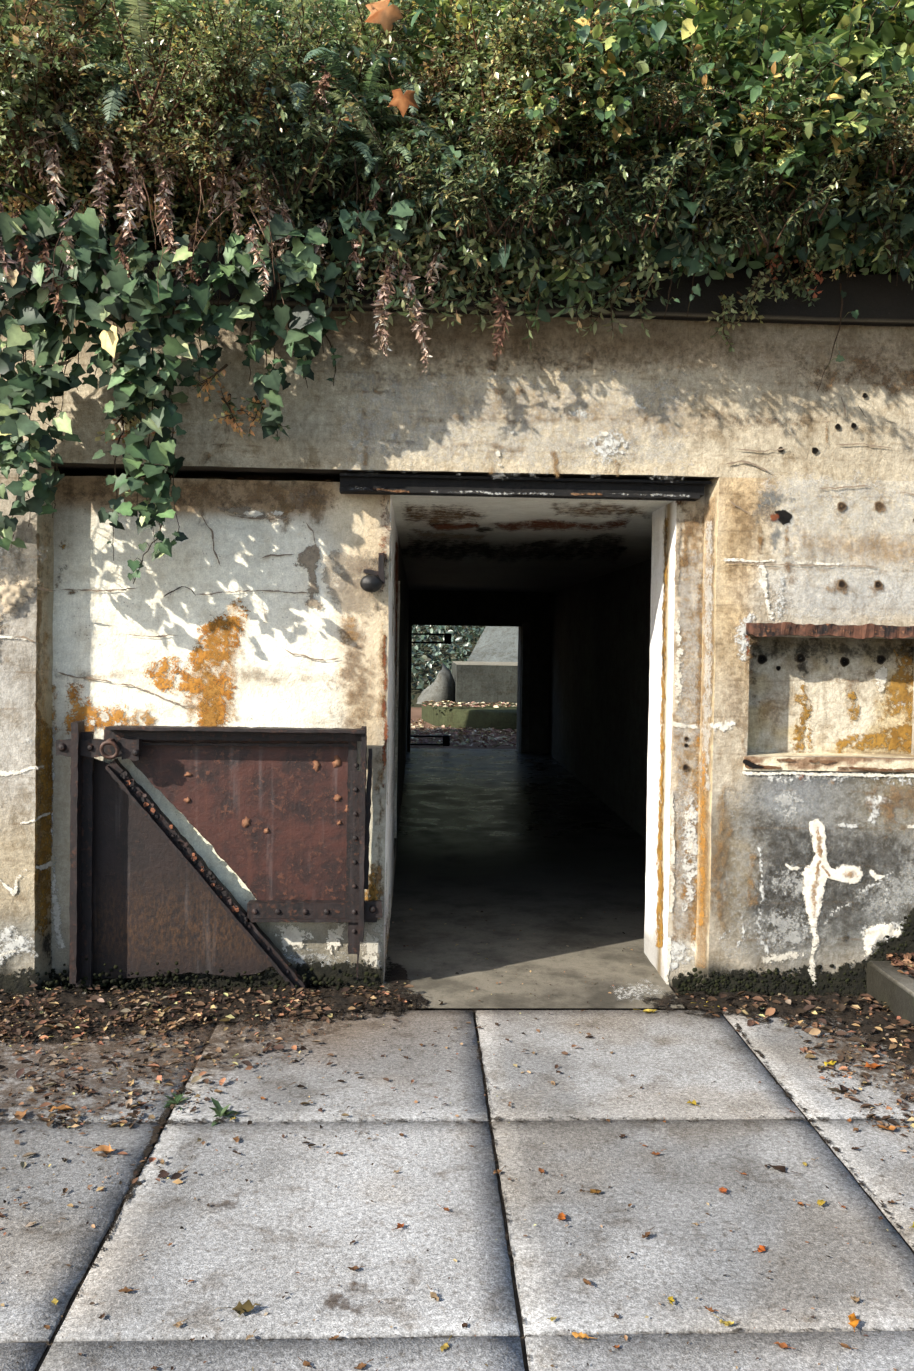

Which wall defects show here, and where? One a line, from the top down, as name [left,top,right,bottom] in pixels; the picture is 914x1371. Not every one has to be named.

crack [61,511,316,598]
corrosion [34,534,157,936]
crack [58,672,193,707]
corrosion [143,598,265,727]
crack [285,649,339,661]
corrosion [312,755,341,772]
damp [665,498,914,997]
corrosion [793,684,812,753]
corrosion [835,642,914,754]